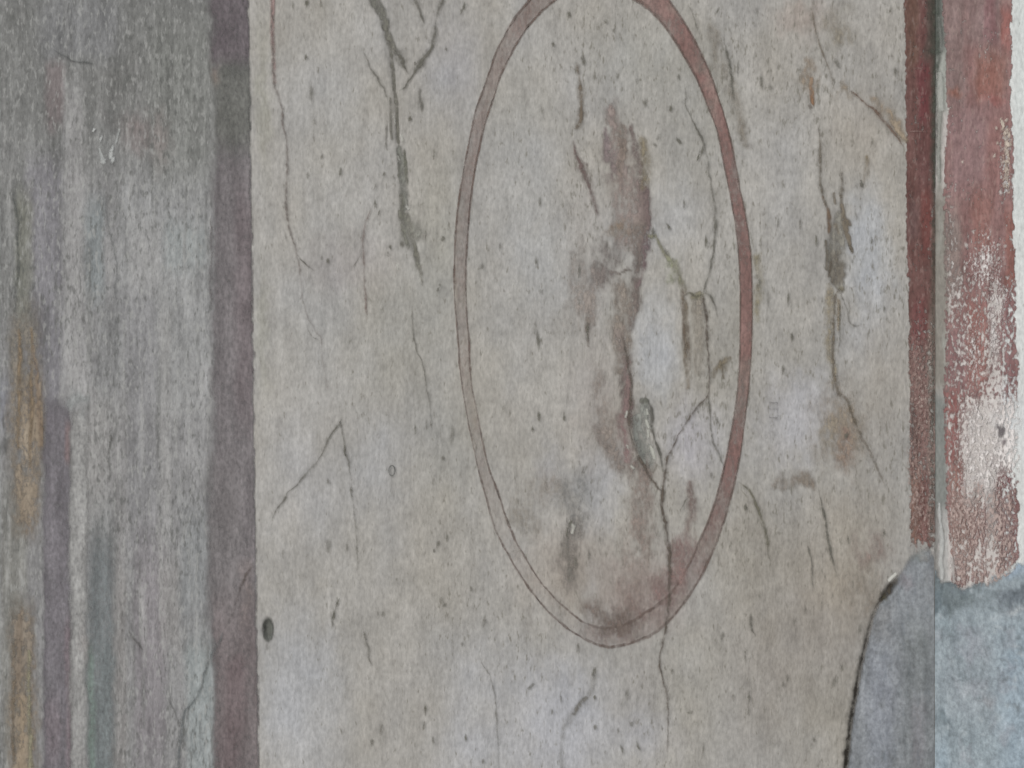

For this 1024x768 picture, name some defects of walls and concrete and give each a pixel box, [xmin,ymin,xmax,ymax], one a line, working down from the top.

crack [269,0,277,74]
crack [624,176,721,723]
water stain [648,235,702,366]
crack [832,294,878,469]
peeling [948,396,1019,587]
peeling [965,235,1007,381]